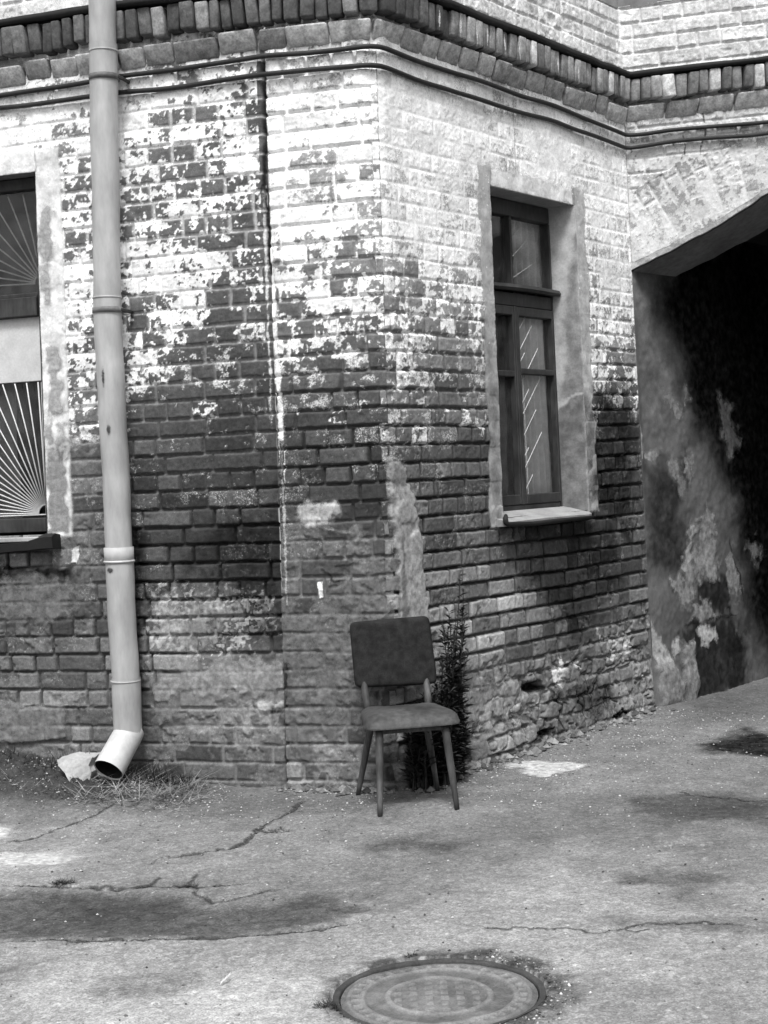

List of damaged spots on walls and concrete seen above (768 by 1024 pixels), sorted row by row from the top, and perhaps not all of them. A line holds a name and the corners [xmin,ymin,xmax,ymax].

peeling [118,32,768,445]
peeling [641,434,695,496]
peeling [718,394,742,459]
peeling [669,502,762,646]
peeling [651,622,681,667]
damp [683,578,745,696]
crack [14,801,303,903]
crack [469,921,732,933]